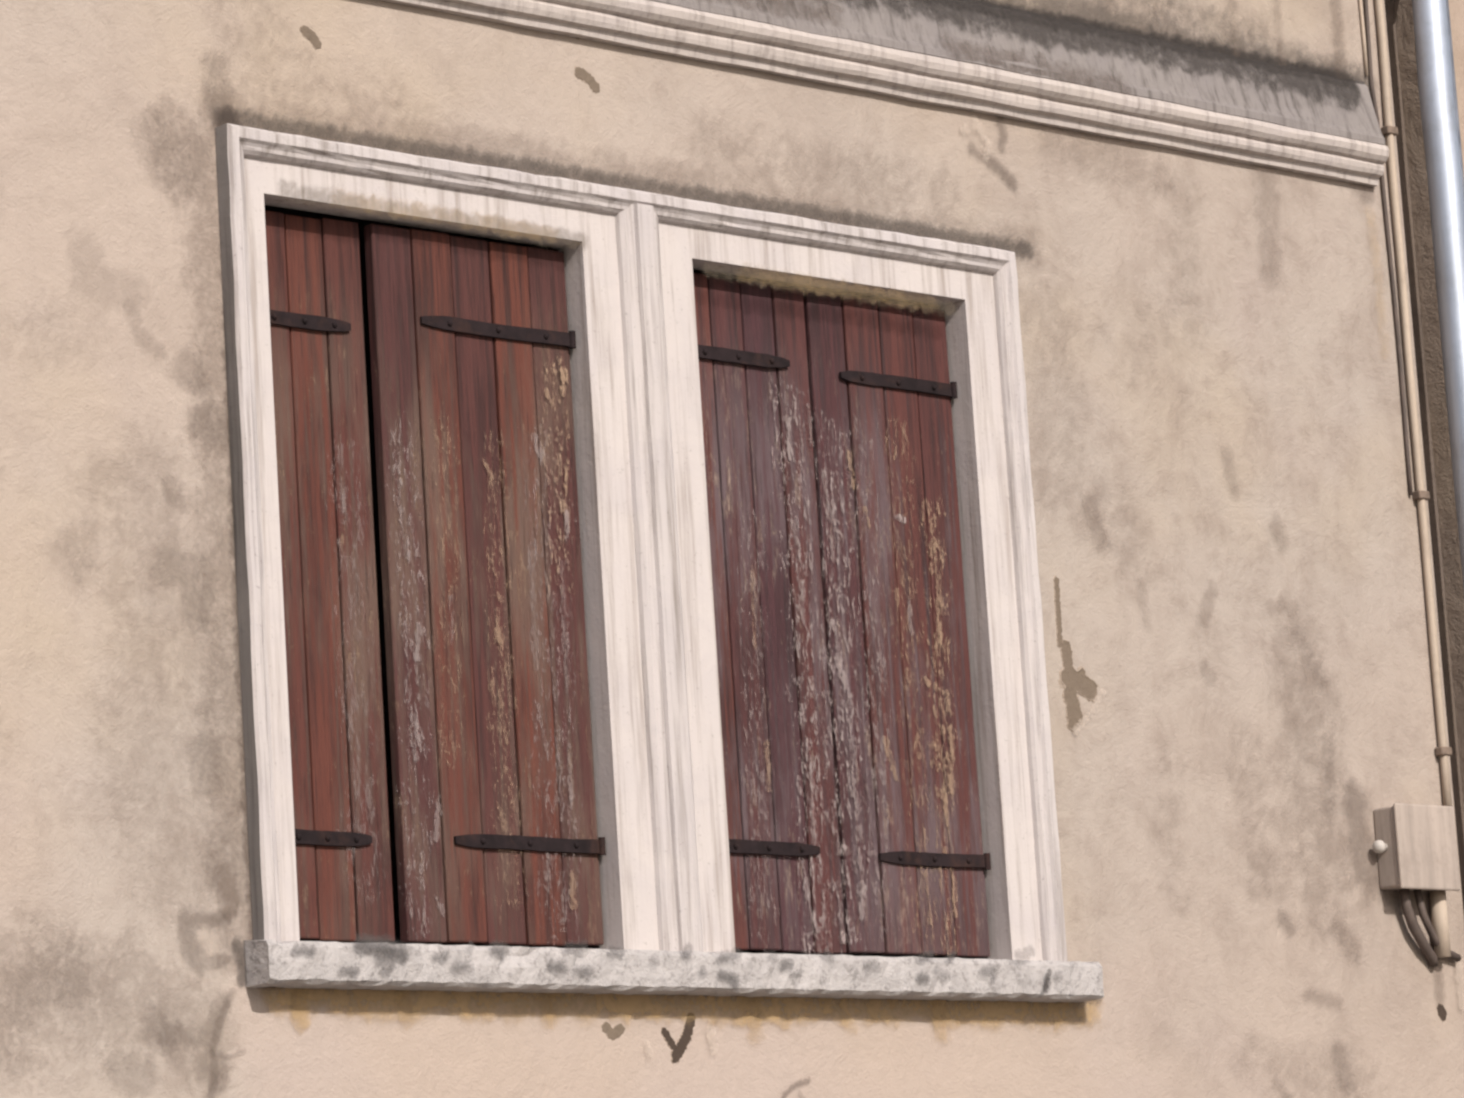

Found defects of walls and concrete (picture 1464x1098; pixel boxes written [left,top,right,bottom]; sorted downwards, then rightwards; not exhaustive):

damp [946,0,1355,87]
spalling [1053,576,1098,732]